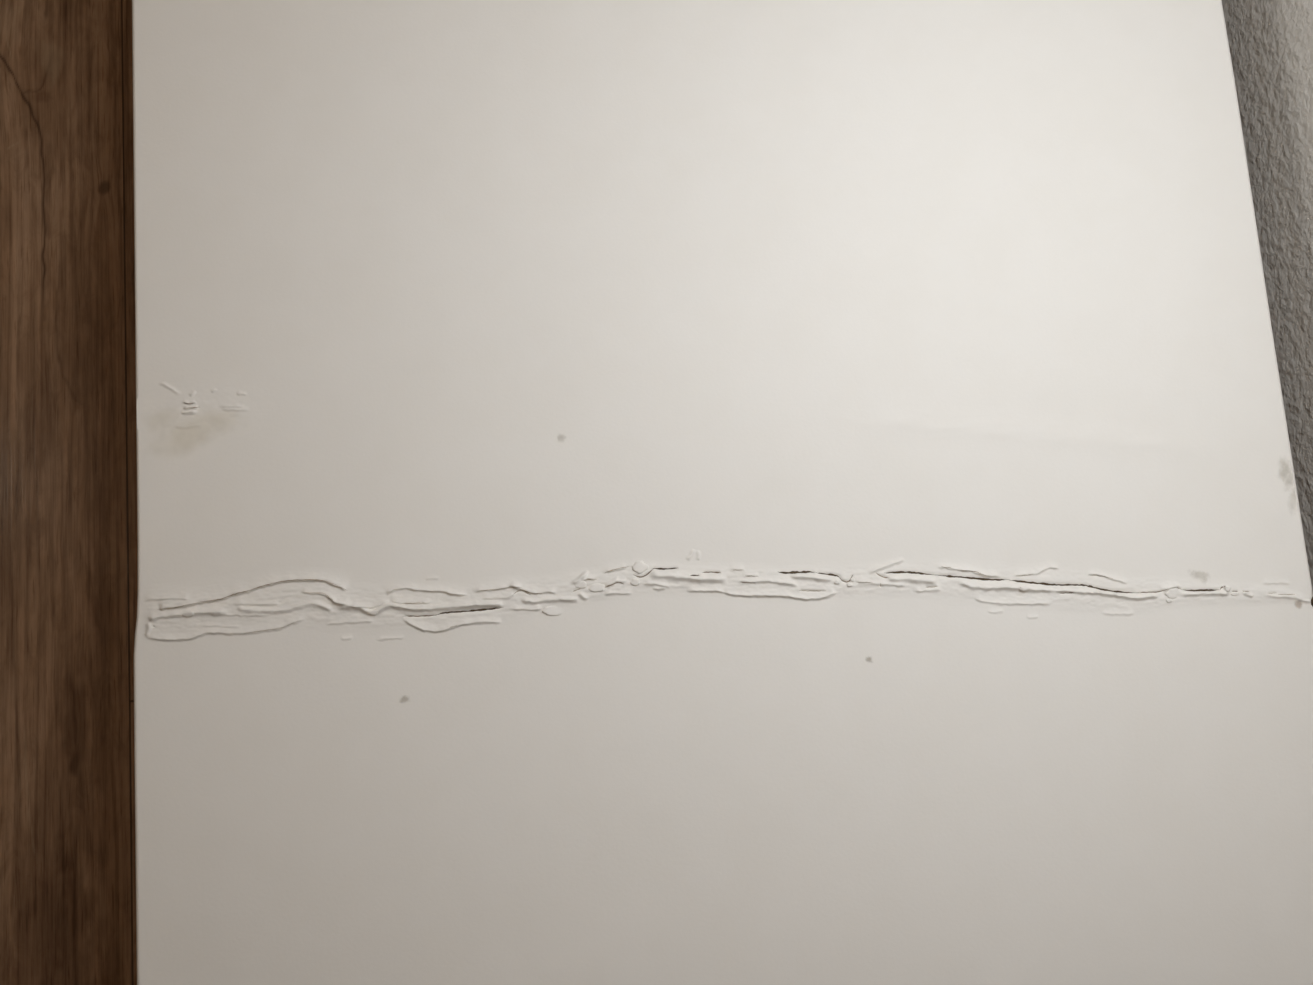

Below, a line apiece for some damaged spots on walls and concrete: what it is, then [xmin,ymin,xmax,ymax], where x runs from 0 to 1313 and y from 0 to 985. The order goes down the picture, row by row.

crack [142,548,1311,644]